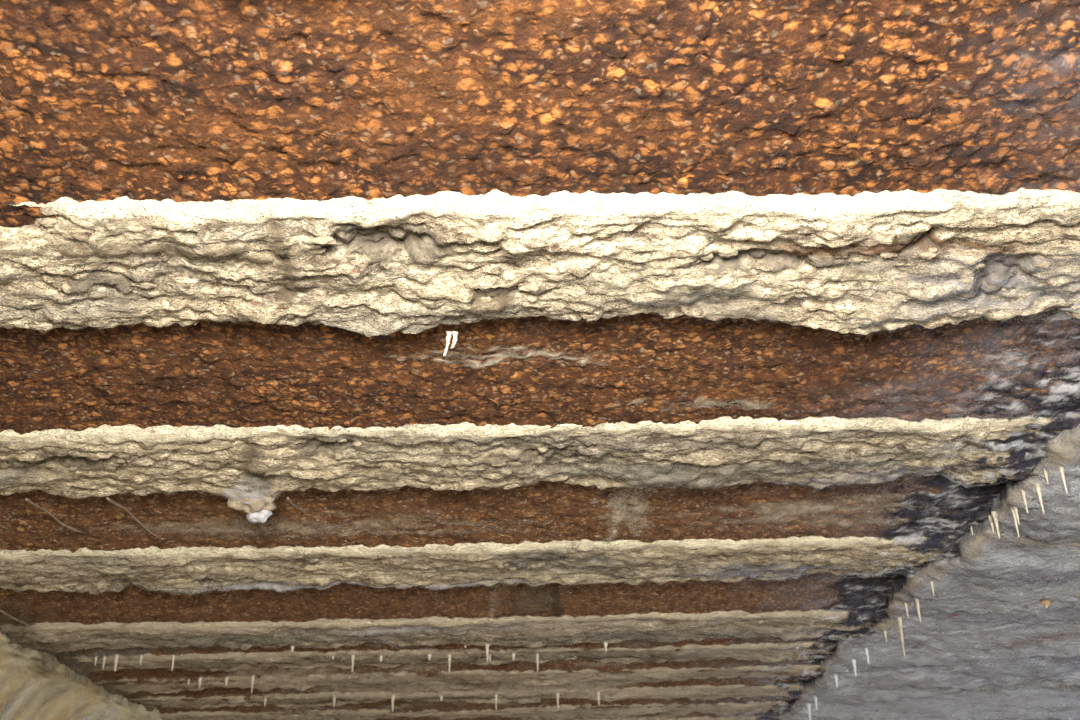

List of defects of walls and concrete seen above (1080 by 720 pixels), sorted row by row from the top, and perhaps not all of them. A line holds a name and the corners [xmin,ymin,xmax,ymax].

water stain [743,354,1080,720]
corrosion [439,642,527,655]
corrosion [87,668,265,702]
corrosion [394,702,542,713]